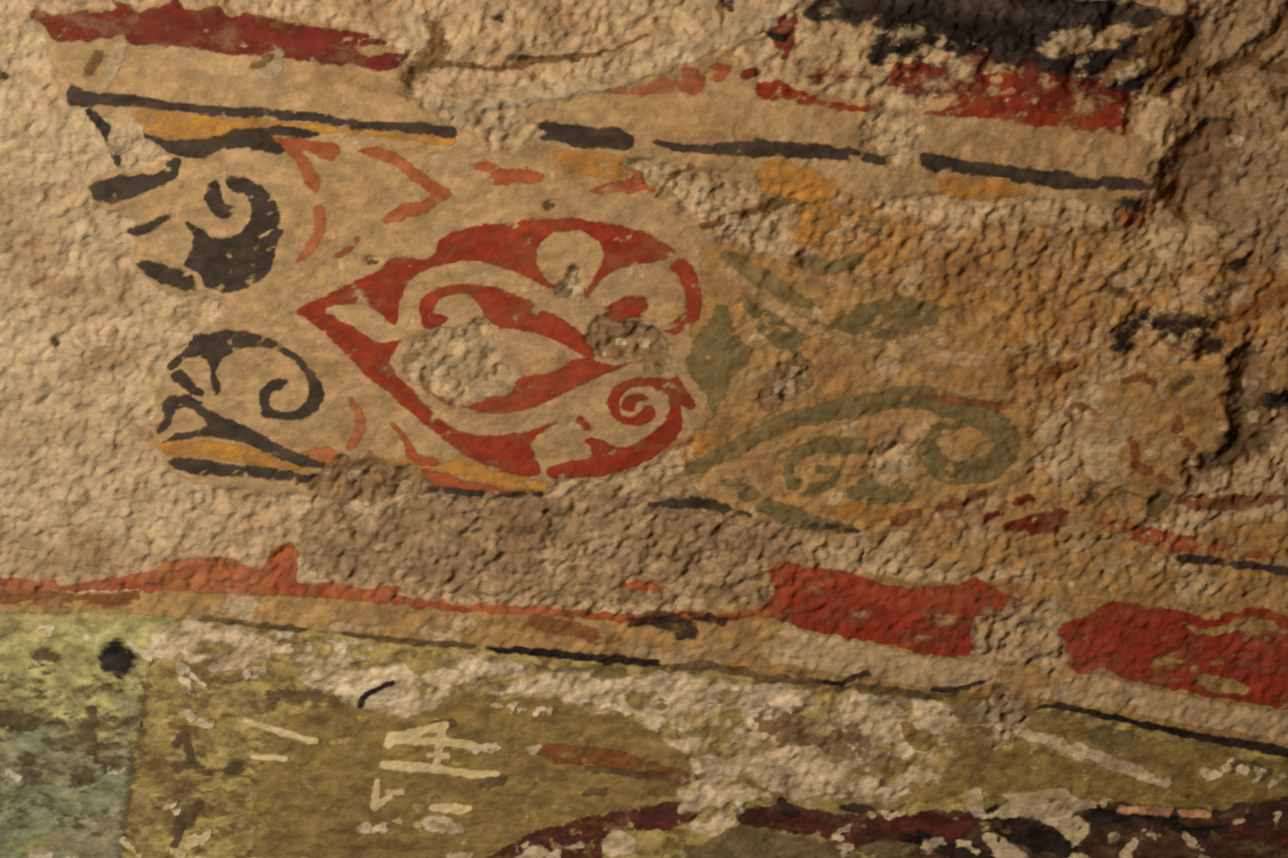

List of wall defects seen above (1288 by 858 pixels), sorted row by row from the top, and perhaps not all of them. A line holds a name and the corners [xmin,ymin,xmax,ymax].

peeling [889,26,923,41]
peeling [1044,23,1092,67]
peeling [1115,58,1145,80]
spalling [401,317,521,407]
peeling [128,616,1171,836]
peeling [1199,758,1286,788]
peeling [920,788,1211,858]
peeling [119,837,142,858]
peeling [516,842,584,858]
peeling [602,830,636,857]
peeling [832,824,855,857]